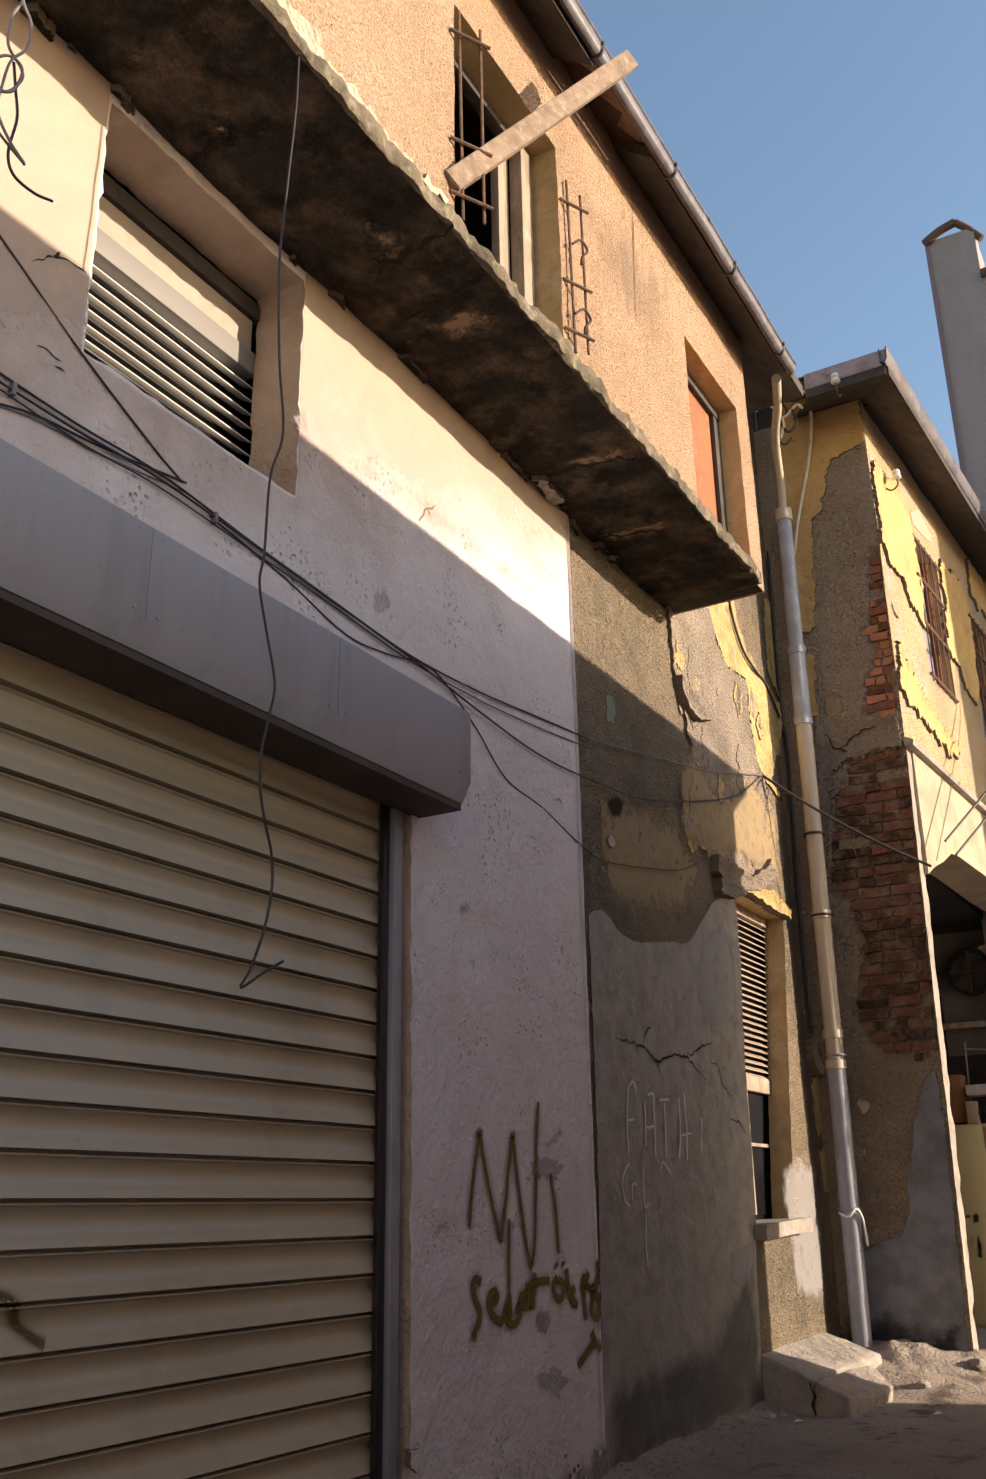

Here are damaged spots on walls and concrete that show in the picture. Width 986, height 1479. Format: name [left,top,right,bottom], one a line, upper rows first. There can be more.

spalling [20,2,77,54]
spalling [110,84,136,116]
flaking render [277,0,448,203]
spalling [328,290,345,311]
spalling [397,353,427,384]
leakage [431,306,495,338]
spalling [489,439,619,564]
peeling [779,399,865,633]
spalling [607,796,624,817]
flaking render [665,598,783,900]
spalling [806,460,986,1062]
crack [616,1026,747,1136]